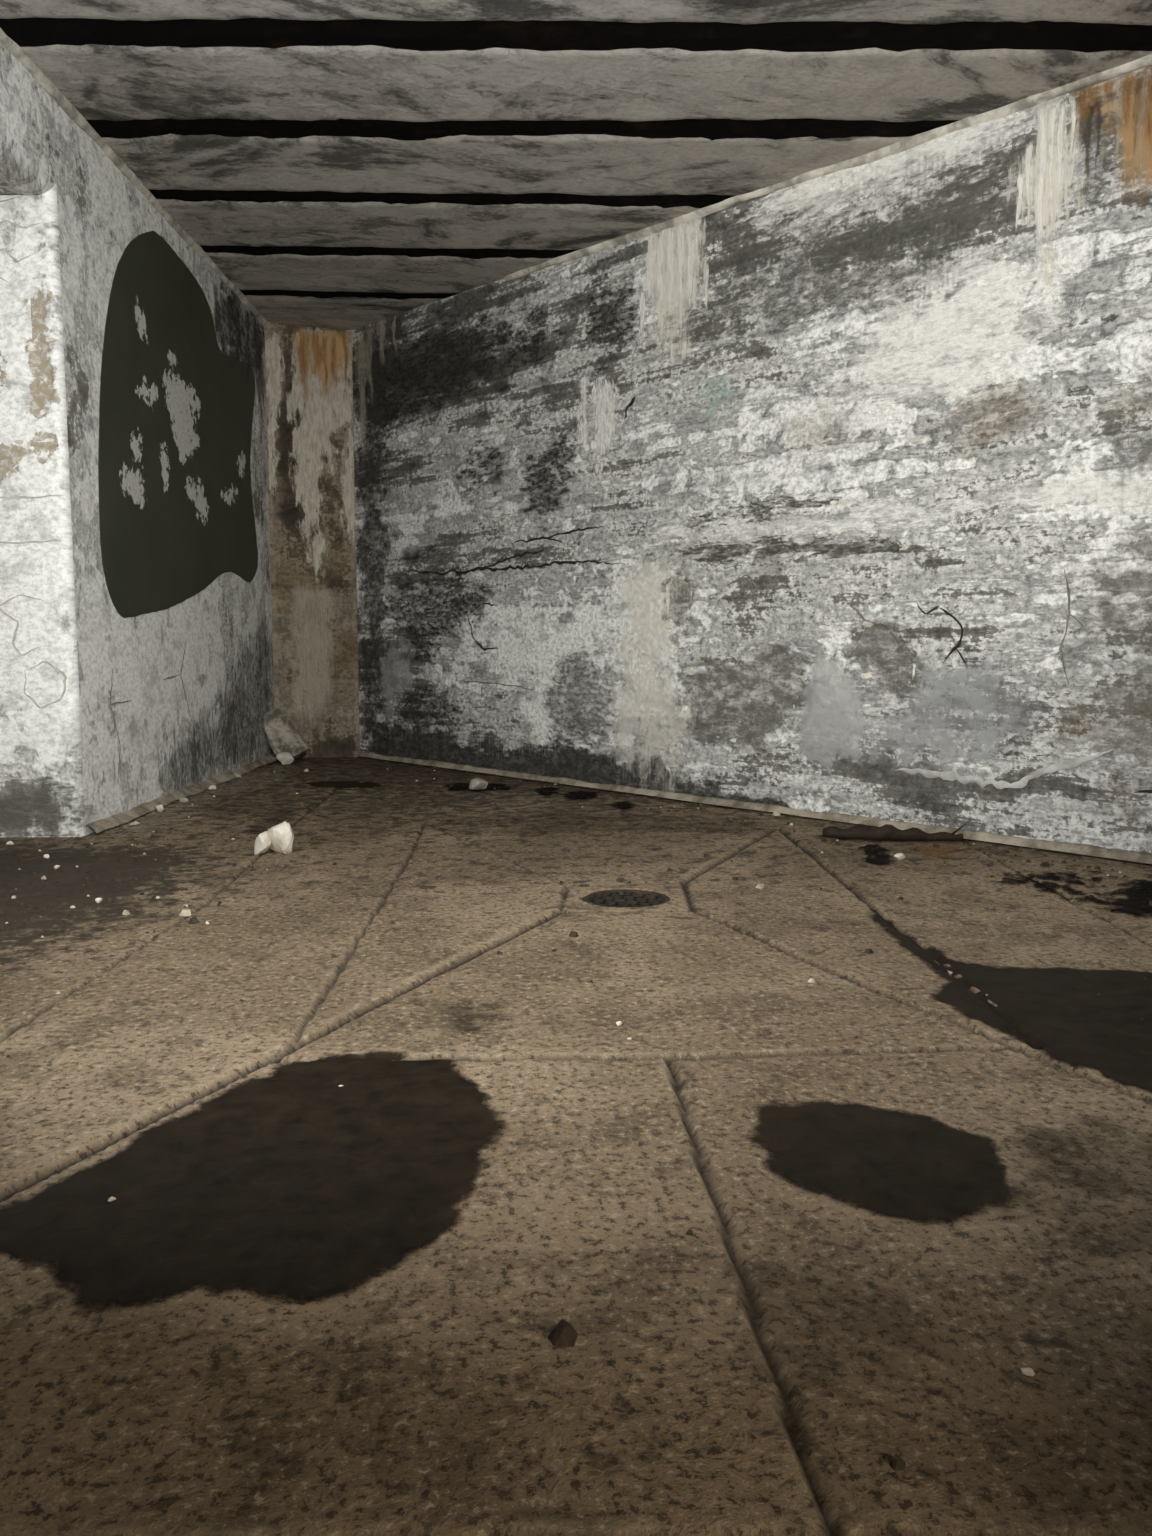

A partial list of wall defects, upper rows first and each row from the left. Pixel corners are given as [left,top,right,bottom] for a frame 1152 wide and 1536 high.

corrosion [1080,72,1152,190]
damp [587,94,1117,429]
peeling [98,231,258,618]
corrosion [286,329,352,581]
damp [337,303,790,815]
damp [653,437,1152,545]
damp [1069,556,1152,765]
damp [870,908,1152,1092]
damp [0,1051,505,1309]
damp [748,1100,1016,1223]